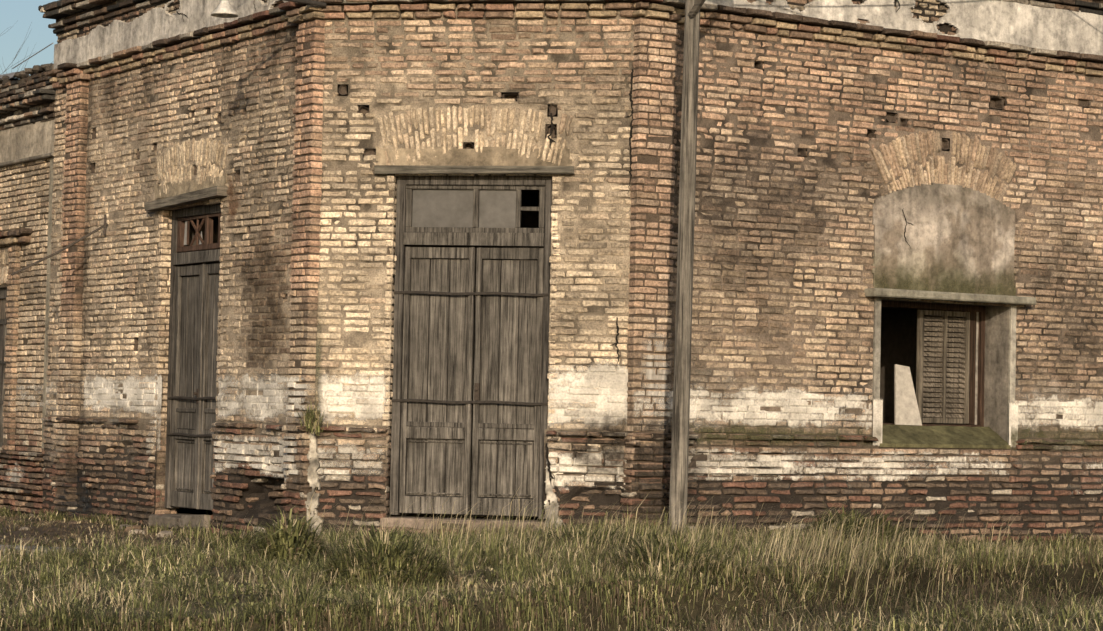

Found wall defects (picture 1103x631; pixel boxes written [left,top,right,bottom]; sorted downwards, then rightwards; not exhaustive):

flaking render [775,0,818,15]
flaking render [903,0,960,37]
peeling [214,373,386,536]